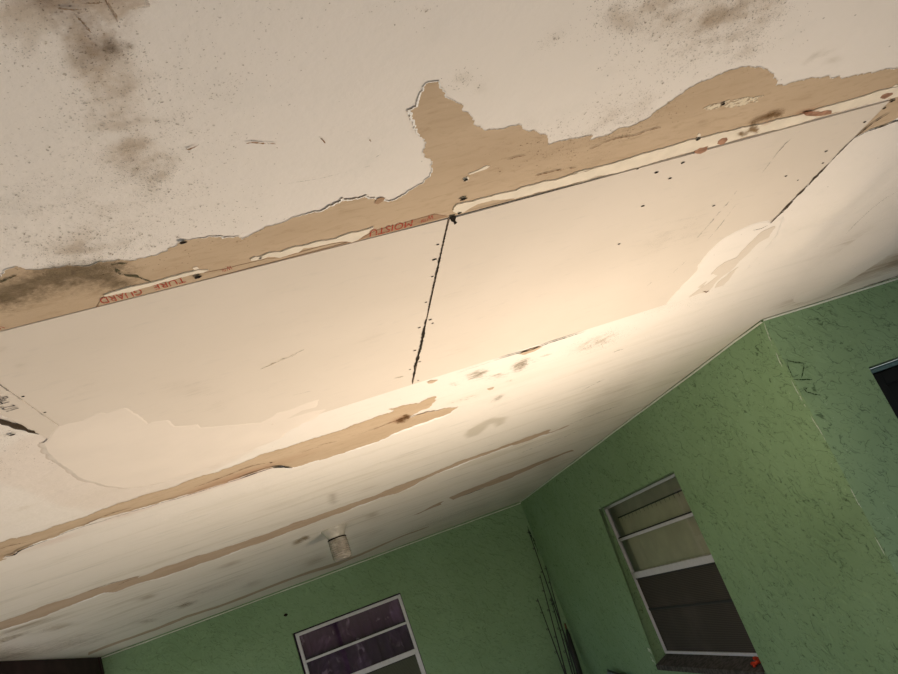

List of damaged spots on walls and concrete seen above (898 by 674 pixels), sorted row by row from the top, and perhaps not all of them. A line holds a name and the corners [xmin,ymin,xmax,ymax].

water stain [23,202,155,282]
peeling [0,66,898,331]
peeling [0,396,458,561]
peeling [88,526,429,655]
peeling [0,425,574,631]